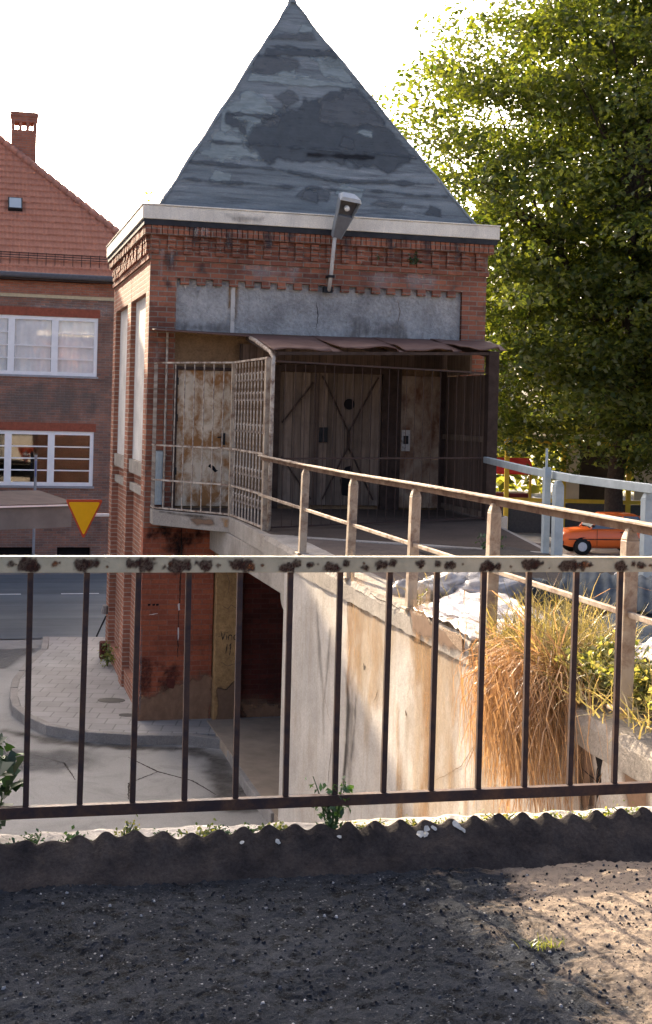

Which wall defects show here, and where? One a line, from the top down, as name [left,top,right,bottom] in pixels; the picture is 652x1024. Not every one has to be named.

corrosion [8,557,60,572]
corrosion [74,559,108,573]
corrosion [126,558,264,574]
crack [127,757,216,799]